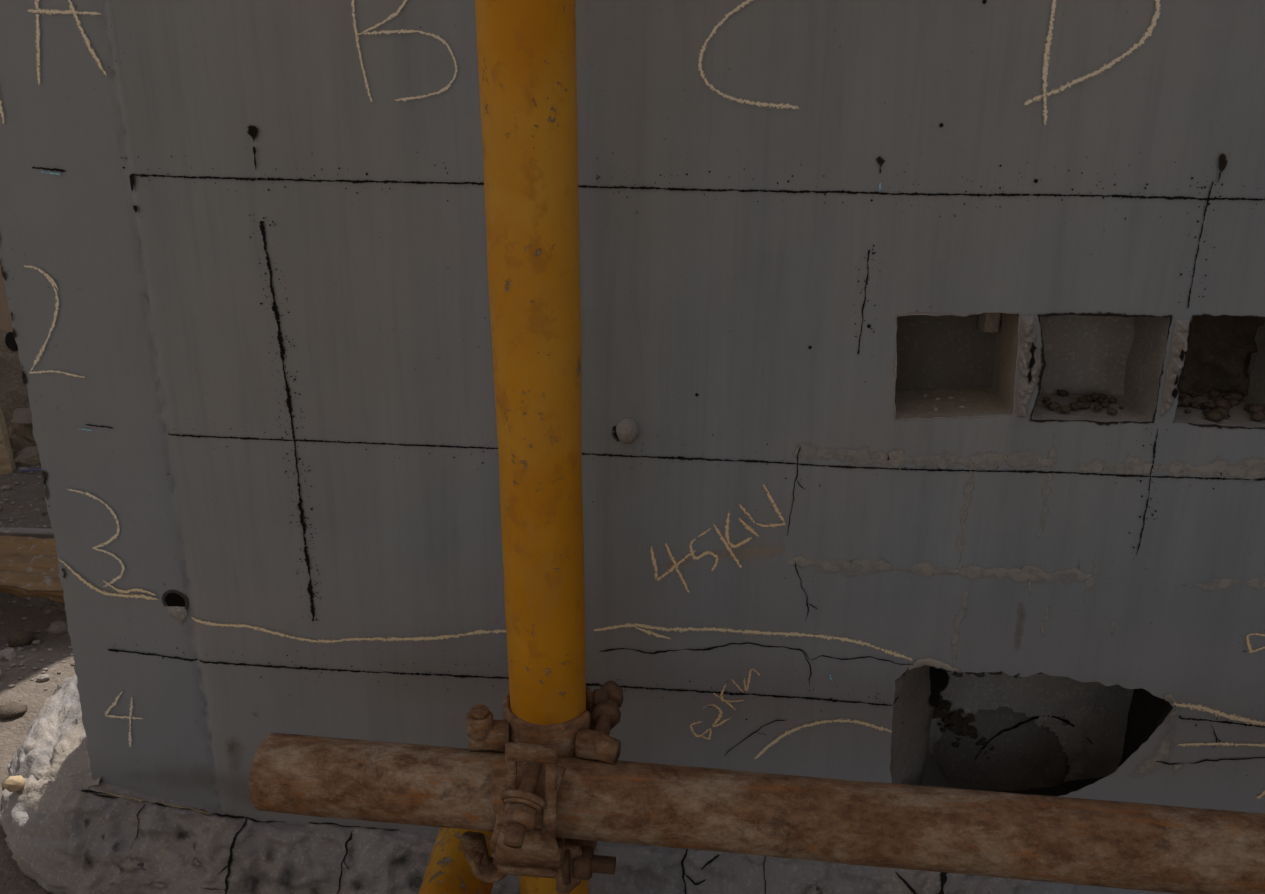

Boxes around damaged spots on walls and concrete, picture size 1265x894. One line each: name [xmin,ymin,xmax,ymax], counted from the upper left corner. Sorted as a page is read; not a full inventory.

crack [600,446,912,686]
spalling [890,665,1173,797]
crack [1156,725,1265,765]
crack [81,790,400,894]
crack [681,849,720,894]
crack [895,872,947,894]